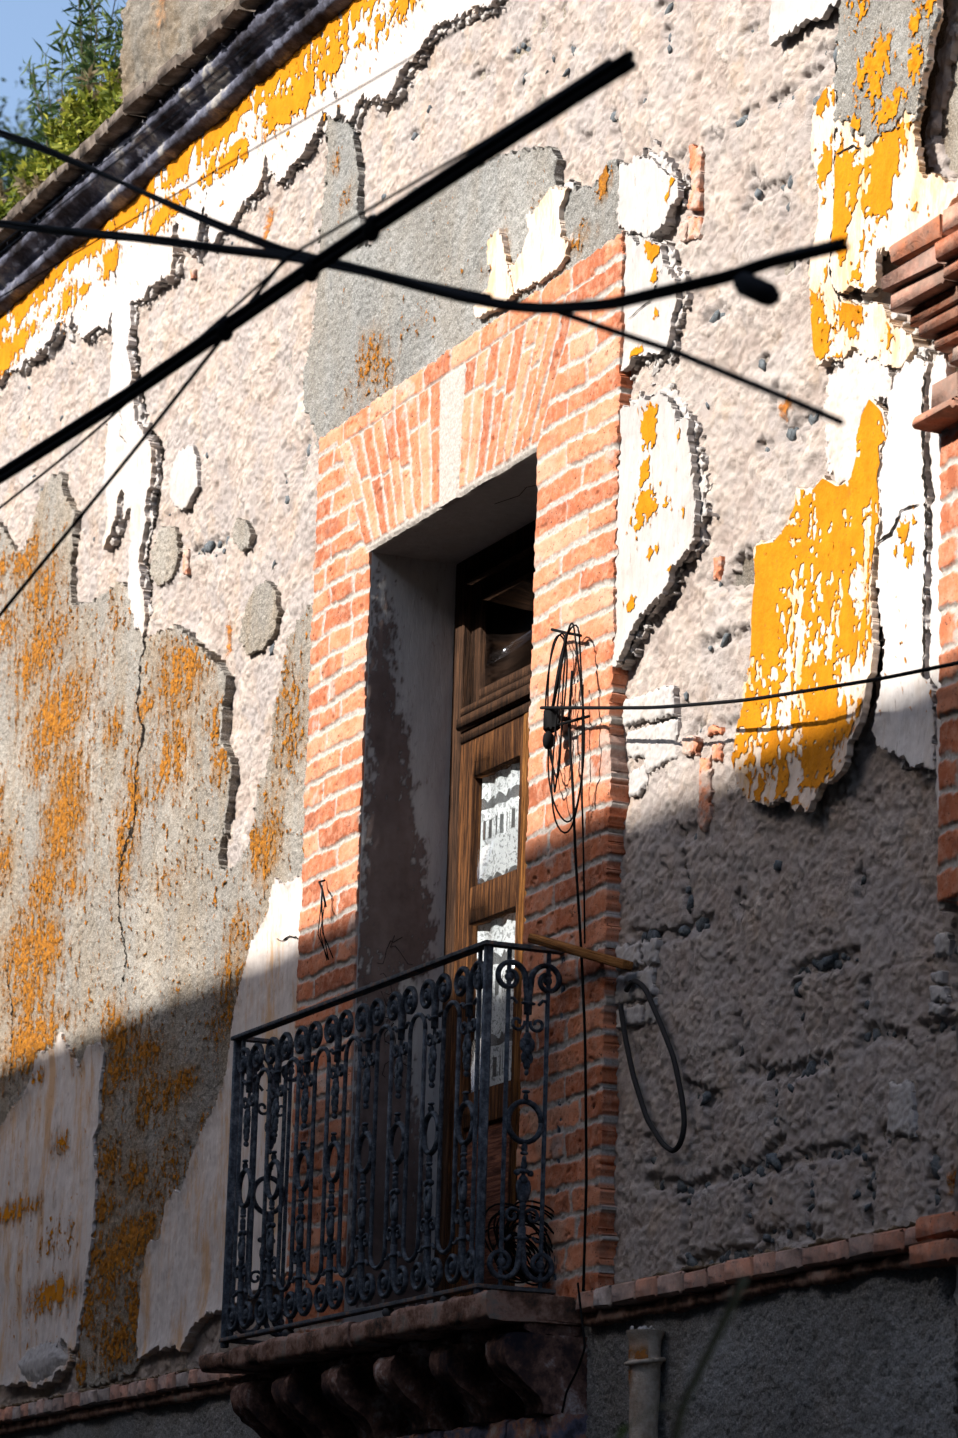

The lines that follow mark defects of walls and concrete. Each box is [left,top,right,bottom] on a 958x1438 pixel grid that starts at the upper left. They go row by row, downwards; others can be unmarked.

crack [113,216,165,1002]
spalling [0,282,320,1407]